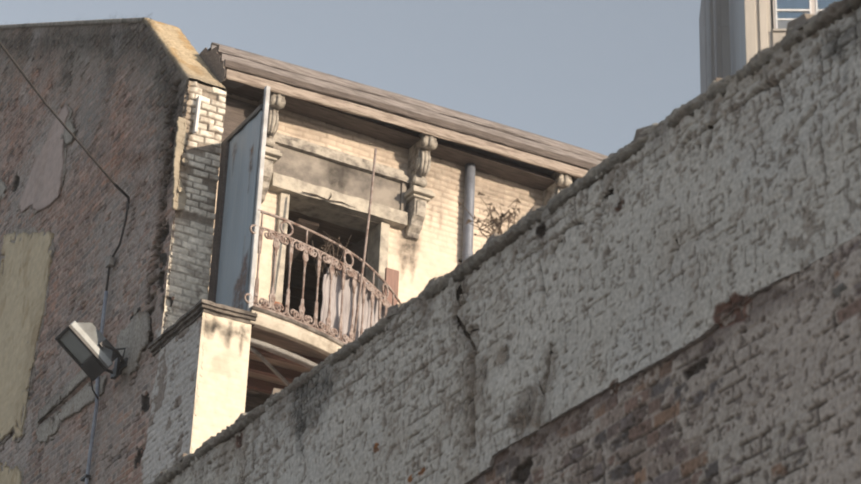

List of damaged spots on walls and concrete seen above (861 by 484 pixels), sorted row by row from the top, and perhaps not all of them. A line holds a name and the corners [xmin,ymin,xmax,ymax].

flaking render [11,104,73,217]
spalling [535,223,547,237]
flaking render [0,227,55,446]
spalling [141,391,150,415]
crack [456,285,479,368]
flaking render [471,228,861,484]